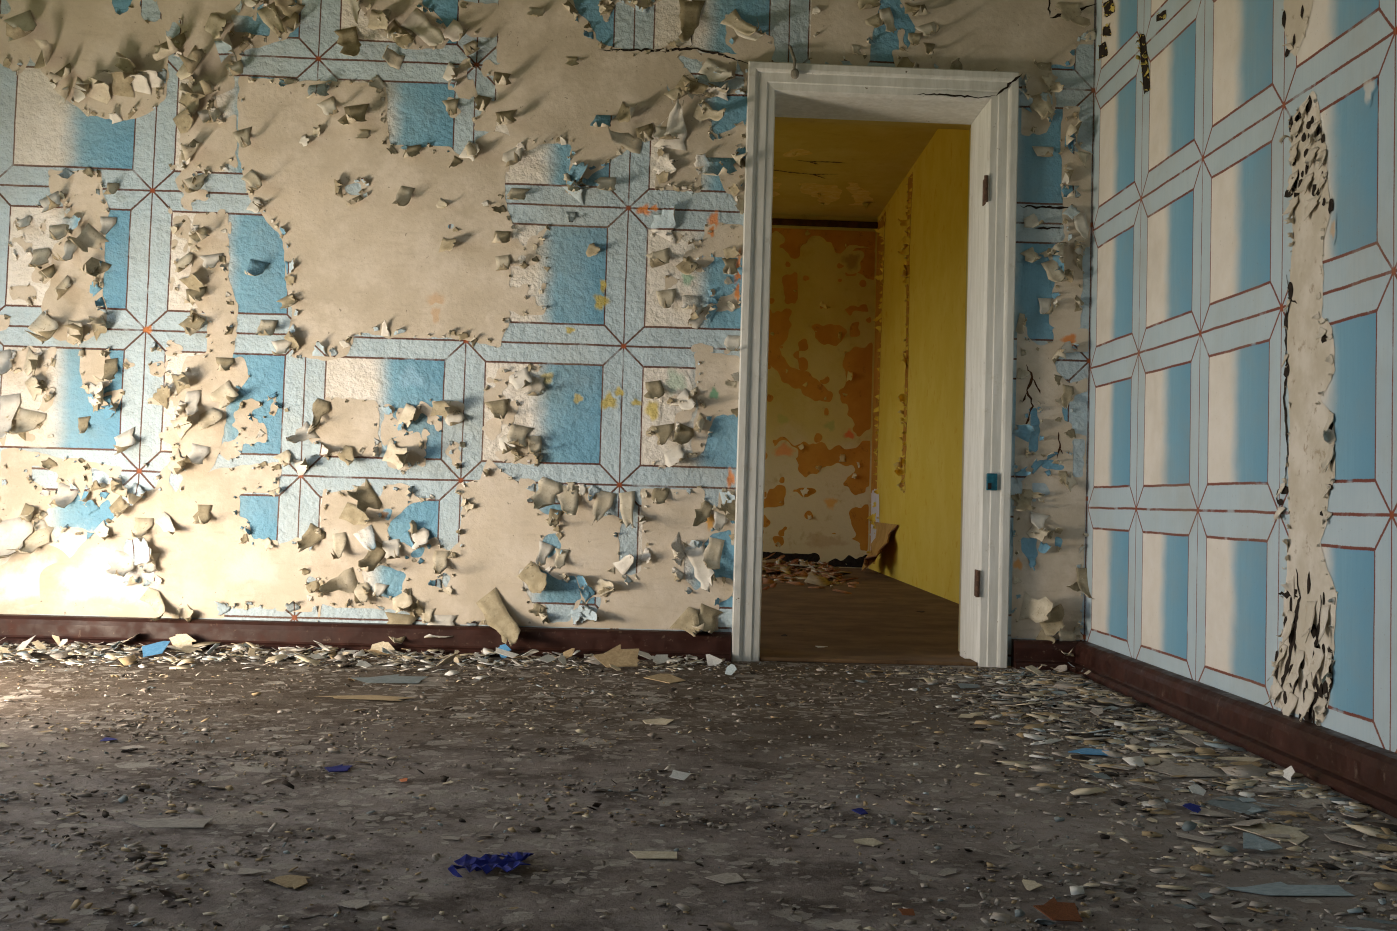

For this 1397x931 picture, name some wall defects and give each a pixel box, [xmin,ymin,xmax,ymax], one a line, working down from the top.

peeling [0,0,775,646]
peeling [763,172,913,564]
peeling [809,0,1115,657]
peeling [1136,34,1151,94]
peeling [1264,91,1338,726]